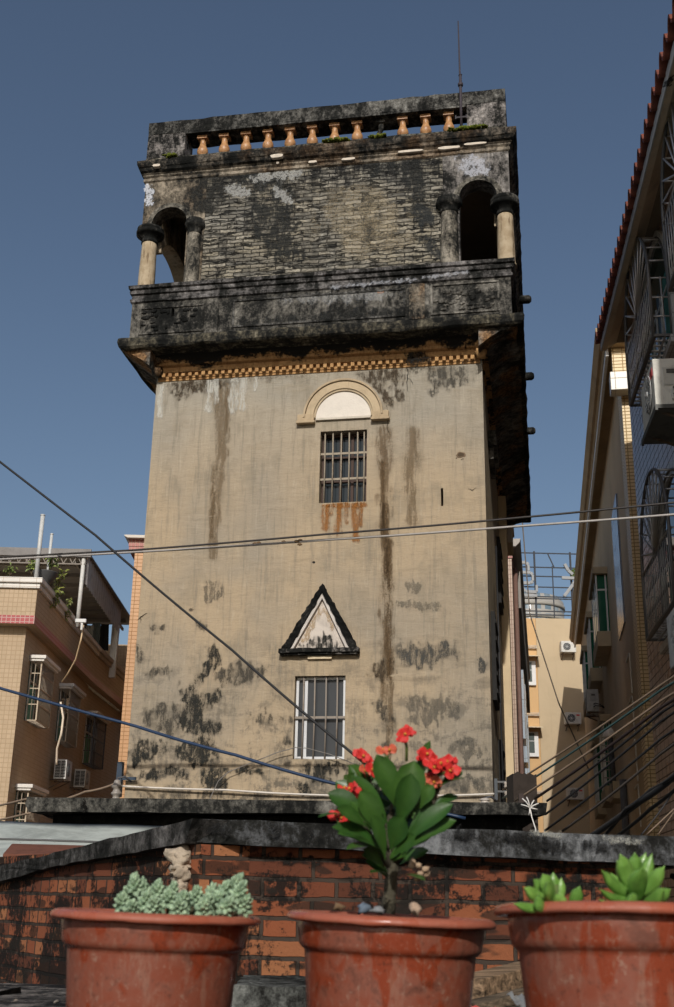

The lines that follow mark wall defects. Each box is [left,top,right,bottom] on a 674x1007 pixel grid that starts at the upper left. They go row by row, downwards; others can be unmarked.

water stain [144,184,154,206]
water stain [190,170,306,263]
water stain [360,192,376,243]
water stain [367,159,441,259]
water stain [459,154,489,177]
water stain [157,376,257,558]
corrosion [322,502,366,541]
water stain [379,428,392,587]
water stain [132,644,264,799]
water stain [373,605,458,758]